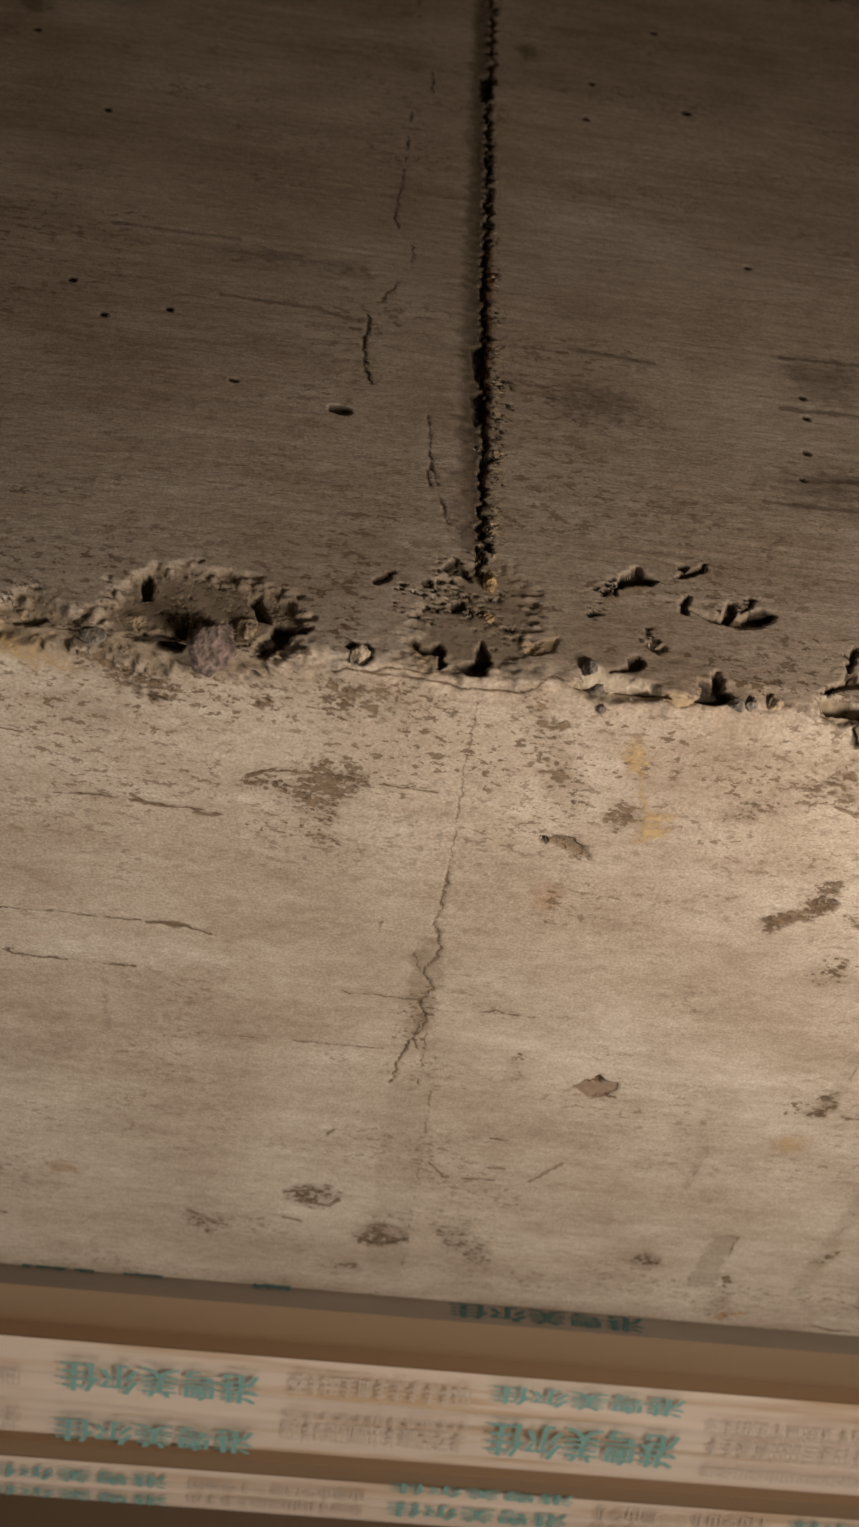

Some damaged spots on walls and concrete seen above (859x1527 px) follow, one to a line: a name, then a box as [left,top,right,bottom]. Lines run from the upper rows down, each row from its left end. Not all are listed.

spalling [394,558,560,656]
spalling [586,570,655,618]
spalling [677,566,705,579]
spalling [679,597,775,630]
spalling [0,593,461,722]
spalling [574,628,784,714]
spalling [820,648,859,698]
peeling [243,761,365,845]
peeling [725,766,859,820]
crack [333,667,564,1084]
peeling [762,881,859,933]
spalling [573,1074,619,1098]